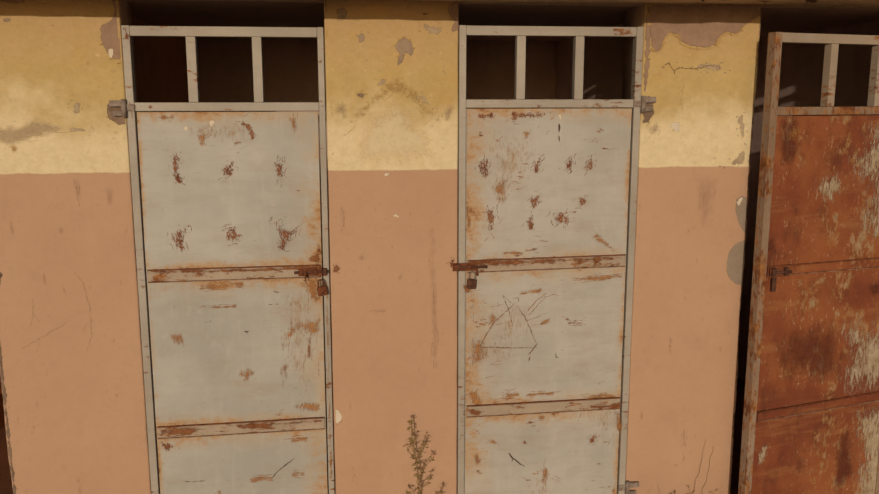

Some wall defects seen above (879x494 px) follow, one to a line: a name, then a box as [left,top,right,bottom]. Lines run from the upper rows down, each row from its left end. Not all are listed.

peeling [99,0,122,64]
flaking render [393,36,415,65]
flaking render [643,4,761,91]
corrosion [483,179,510,238]
corrosion [546,195,588,227]
corrosion [166,225,192,250]
corrosion [151,249,340,274]
corrosion [270,217,304,252]
corrosion [469,231,617,266]
corrosion [587,393,623,445]
corrosion [161,427,205,451]
corrosion [836,436,852,485]